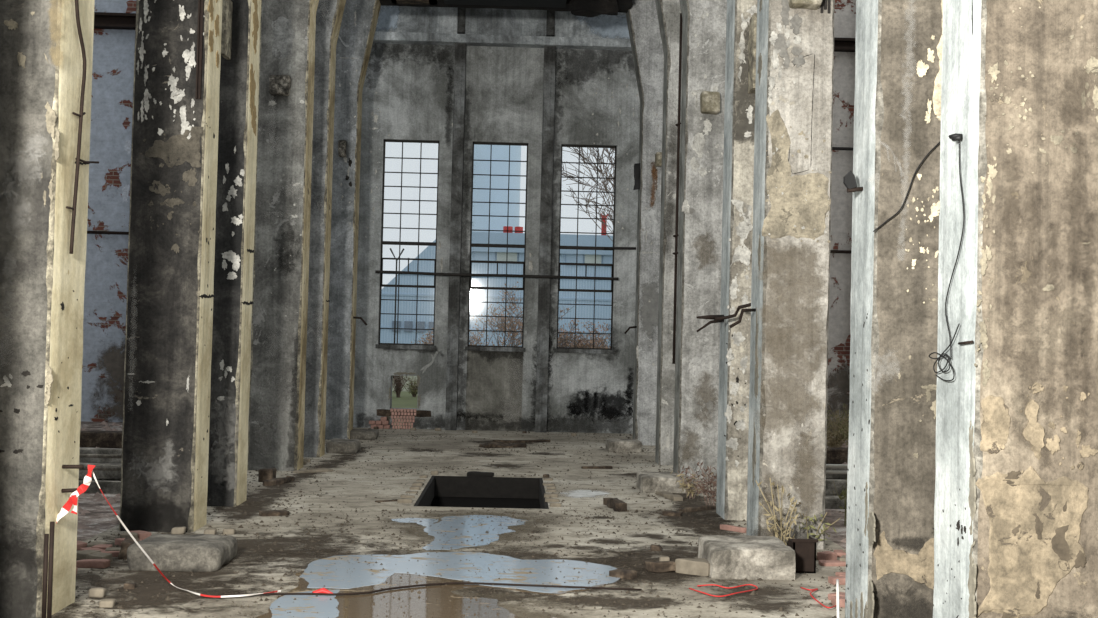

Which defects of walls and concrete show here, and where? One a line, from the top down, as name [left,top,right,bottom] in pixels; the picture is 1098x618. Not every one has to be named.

spalling [122,0,219,229]
water stain [376,6,400,31]
water stain [369,44,454,112]
peeling [916,0,943,123]
peeling [985,60,1034,131]
peeling [222,250,241,280]
peeling [222,146,245,237]
water stain [414,91,634,433]
water stain [536,15,634,375]
spalling [690,0,832,488]
peeling [219,360,235,382]
peeling [817,144,1098,618]